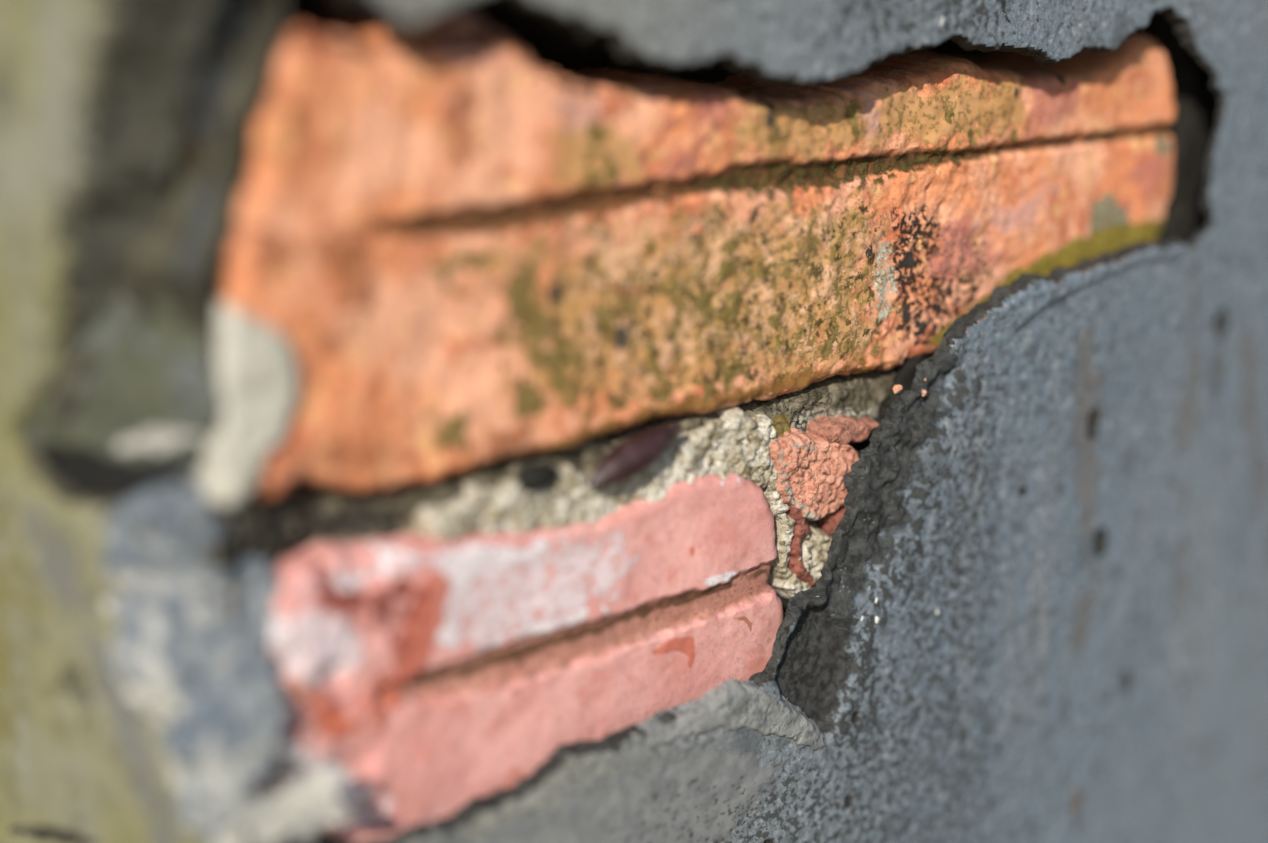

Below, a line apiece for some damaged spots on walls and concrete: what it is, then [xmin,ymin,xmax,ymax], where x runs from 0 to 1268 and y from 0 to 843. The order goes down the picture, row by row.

spalling [24,0,1123,427]
damp [321,224,373,308]
damp [546,273,566,305]
damp [889,205,991,346]
damp [615,326,629,350]
damp [447,358,896,475]
spalling [364,6,1229,843]
spalling [21,440,126,517]
spalling [59,668,90,727]
spalling [272,819,340,843]